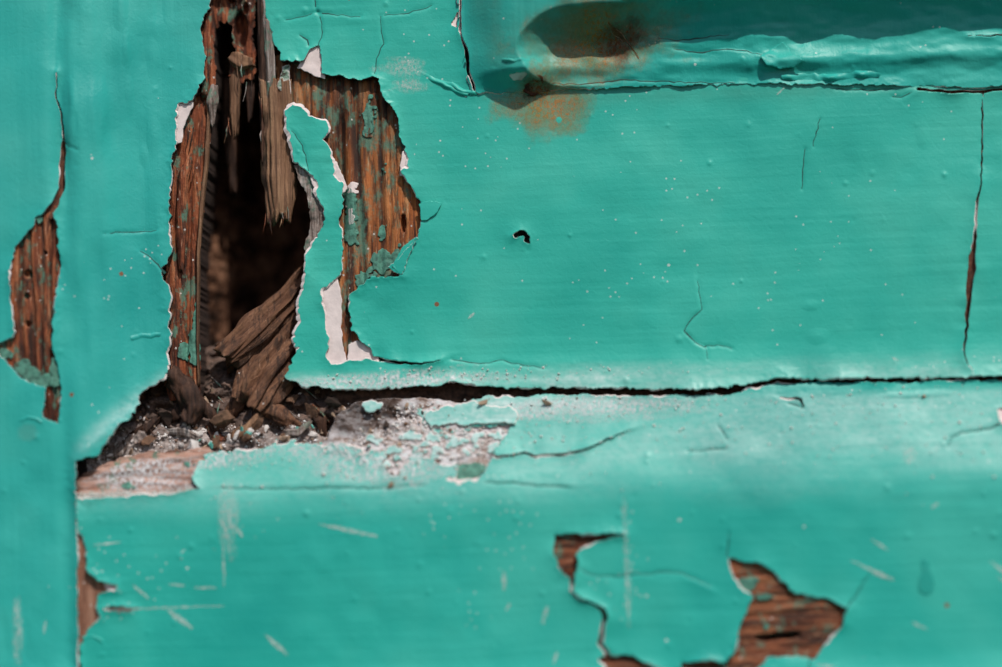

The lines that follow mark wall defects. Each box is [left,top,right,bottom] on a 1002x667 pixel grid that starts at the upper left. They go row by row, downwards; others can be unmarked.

crack [286,0,432,73]
crack [462,40,475,91]
rust [517,78,579,125]
rust [554,3,639,68]
crack [837,88,1002,363]
peeling [0,205,62,423]
peeling [379,357,440,365]
peeling [322,397,518,484]
peeling [77,535,137,652]
peeling [553,533,625,586]
peeling [681,558,847,667]
peeling [599,648,652,667]